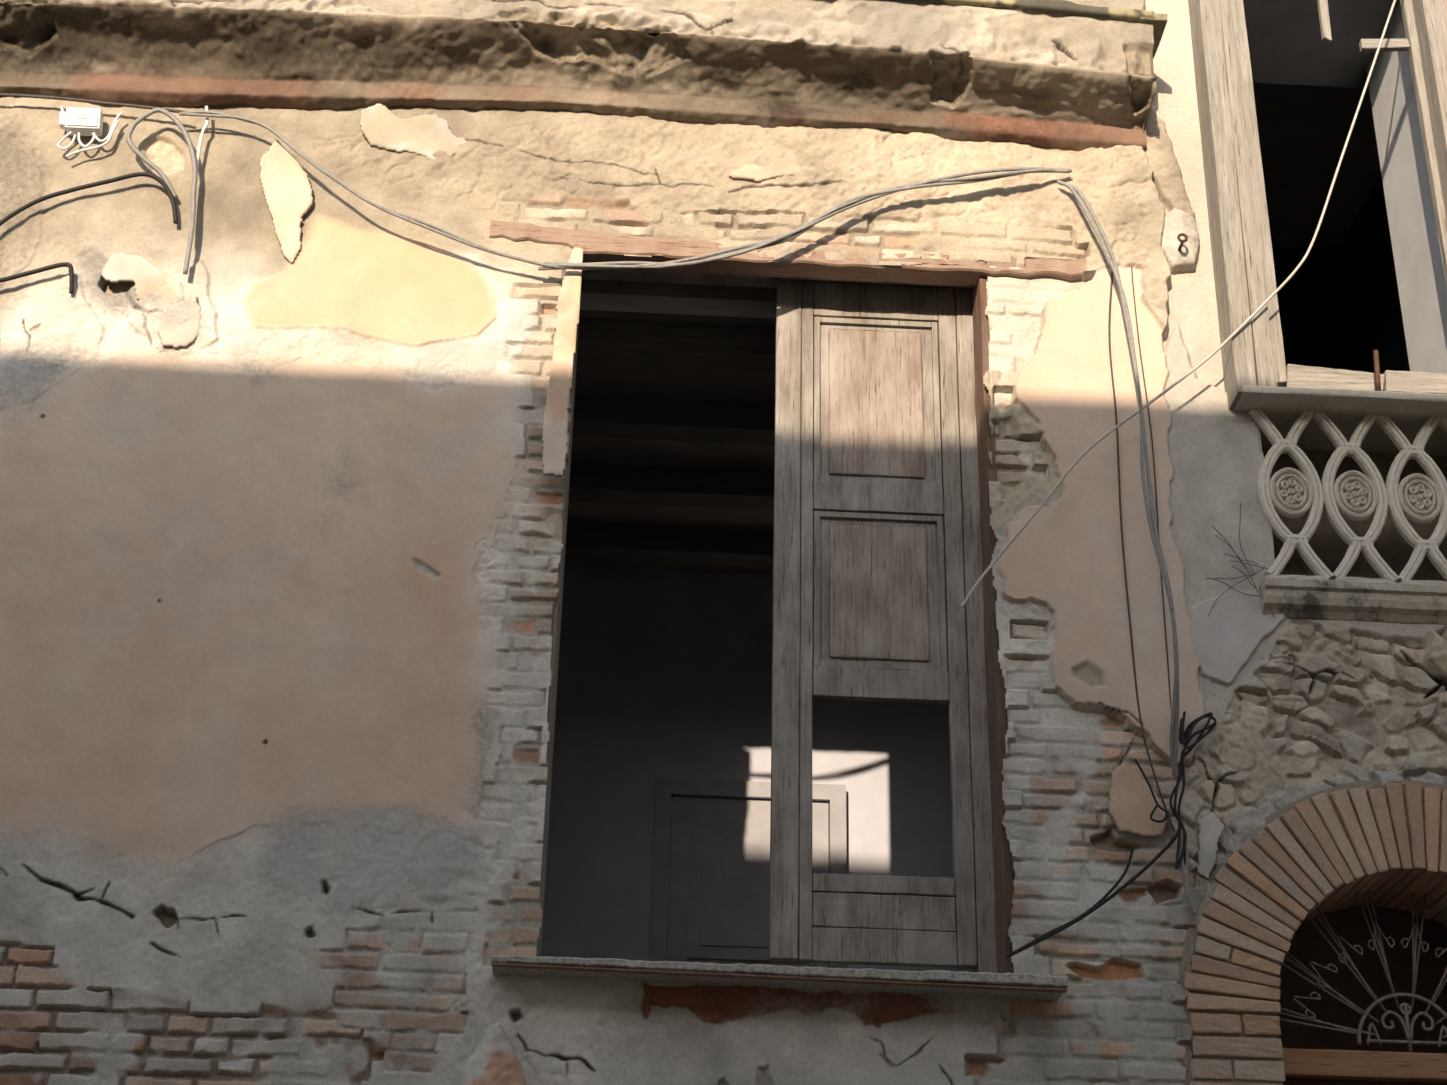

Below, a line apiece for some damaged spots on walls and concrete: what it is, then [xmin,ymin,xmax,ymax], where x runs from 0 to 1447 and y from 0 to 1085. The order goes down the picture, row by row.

flaking render [243,140,496,347]
flaking render [729,151,801,183]
flaking render [0,248,583,1085]
spalling [499,196,1447,1085]
crack [1,864,245,957]